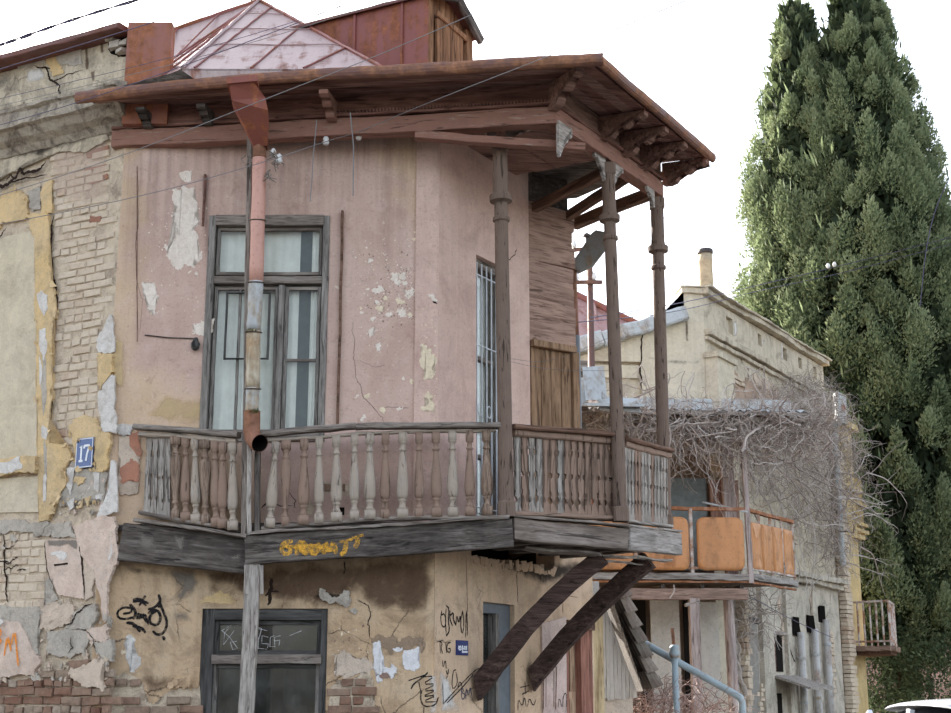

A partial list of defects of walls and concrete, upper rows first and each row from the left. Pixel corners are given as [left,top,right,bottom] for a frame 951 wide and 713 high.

crack [34,65,81,94]
crack [0,161,46,189]
crack [50,216,58,311]
peeling [187,297,215,353]
peeling [352,231,438,417]
flaking render [0,135,207,713]
spalling [327,625,426,713]